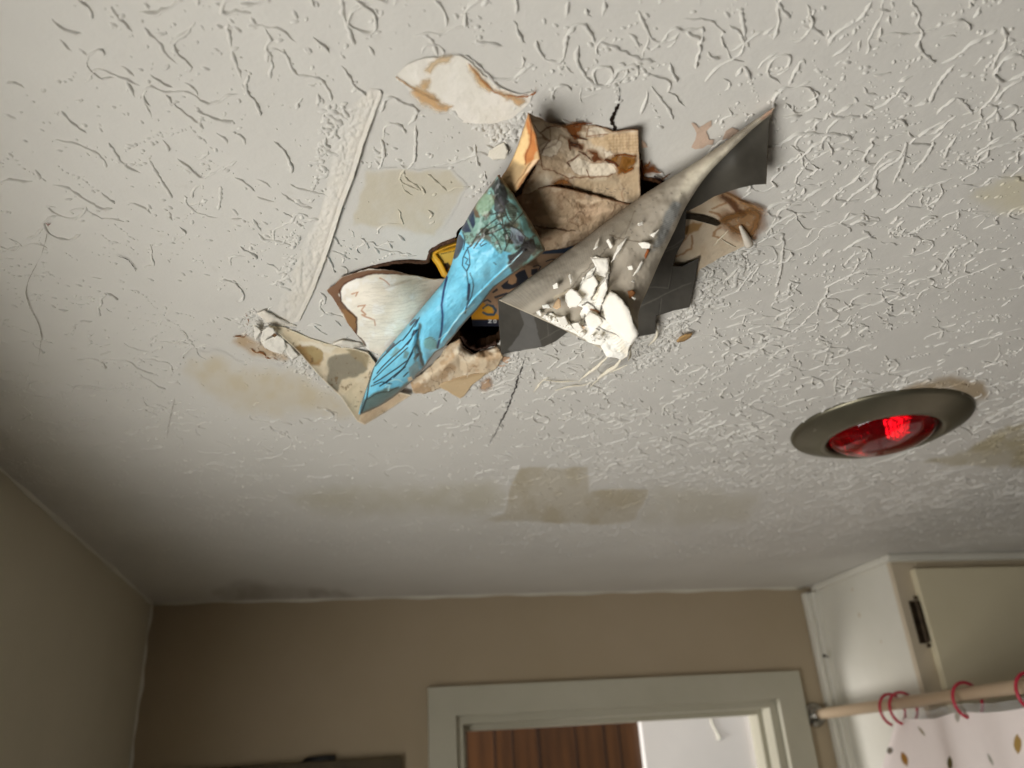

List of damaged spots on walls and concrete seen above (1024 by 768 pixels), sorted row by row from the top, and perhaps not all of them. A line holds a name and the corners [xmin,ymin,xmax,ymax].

flaking render [396,55,533,124]
crack [610,89,620,131]
peeling [254,107,775,425]
crack [489,357,525,445]
water stain [286,465,765,532]